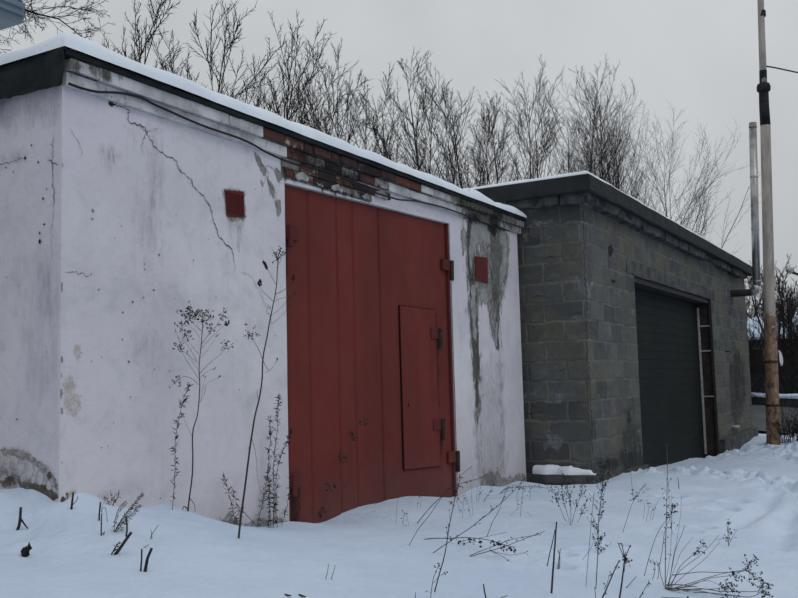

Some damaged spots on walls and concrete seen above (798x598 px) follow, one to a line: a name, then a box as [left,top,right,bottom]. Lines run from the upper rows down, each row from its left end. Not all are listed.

crack [102,76,272,323]
flaking render [255,153,391,217]
leakage [450,190,517,421]
leakage [0,448,58,500]